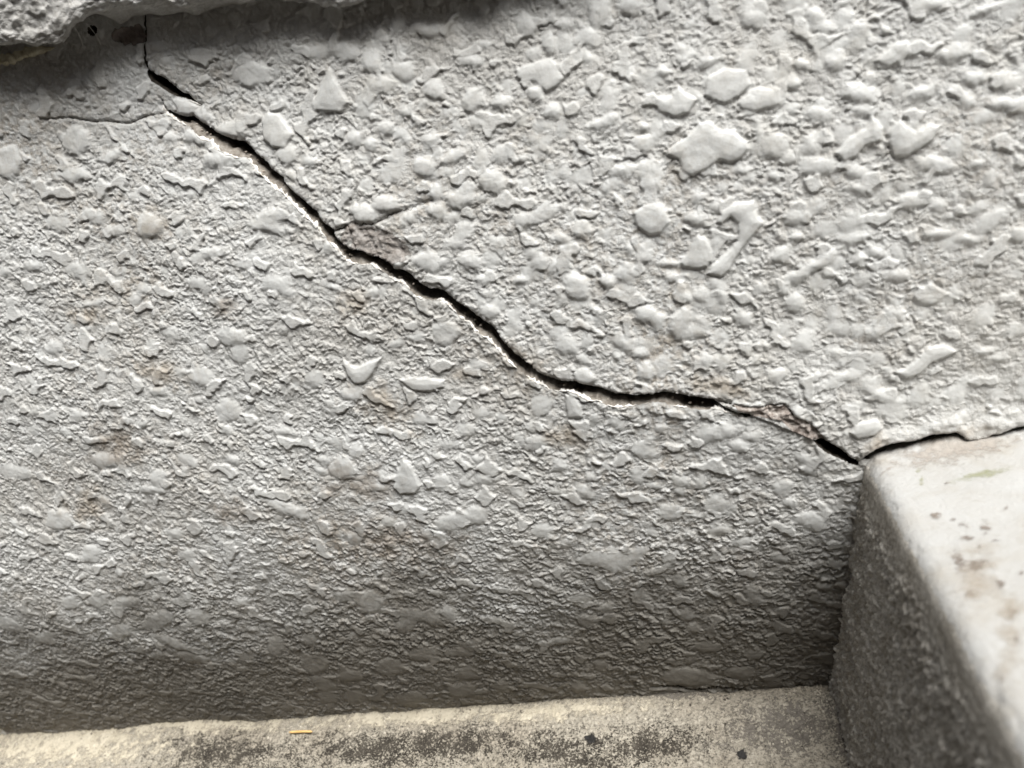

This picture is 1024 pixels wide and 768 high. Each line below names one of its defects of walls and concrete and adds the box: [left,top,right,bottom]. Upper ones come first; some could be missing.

crack [42,15,870,465]